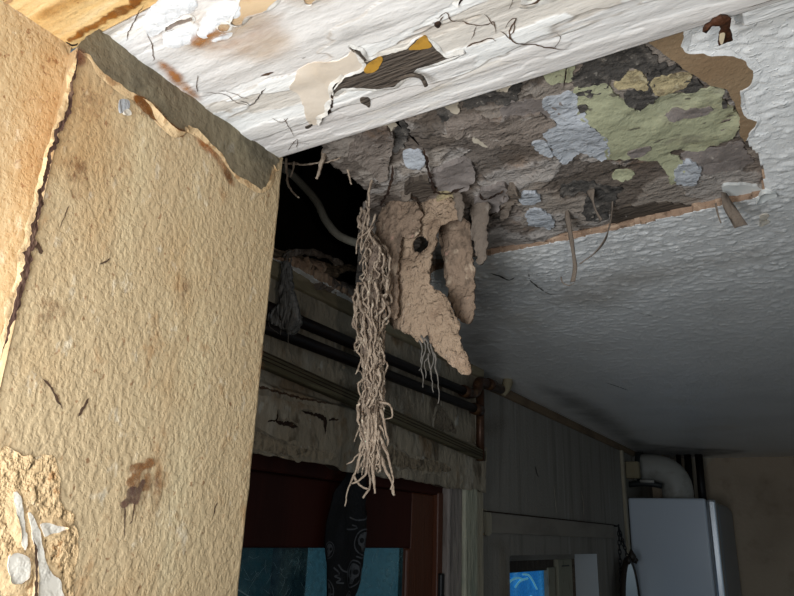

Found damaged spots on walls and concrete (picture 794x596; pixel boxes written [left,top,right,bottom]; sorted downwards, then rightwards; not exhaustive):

water stain [67,0,143,42]
crack [434,0,561,50]
flaking render [76,29,280,193]
peeling [289,35,466,129]
flaking render [348,122,397,183]
peeling [532,140,553,158]
crack [0,42,78,360]
flaking render [403,148,555,230]
peeling [715,181,777,228]
flaking render [253,426,336,465]
flaking render [381,443,451,476]
peeling [0,446,79,596]